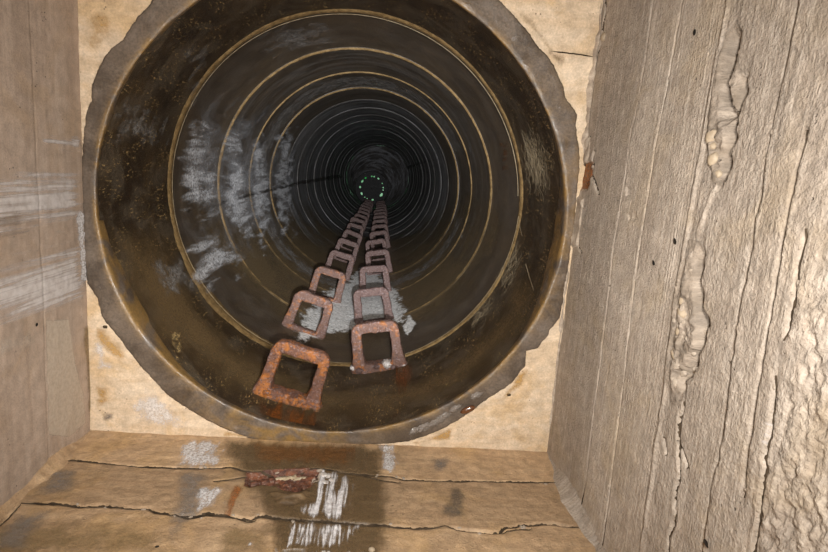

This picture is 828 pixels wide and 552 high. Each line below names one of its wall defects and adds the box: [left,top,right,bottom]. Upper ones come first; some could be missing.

corrosion [582,163,593,189]
water stain [0,173,86,315]
crack [783,229,808,341]
crack [68,459,279,482]
crack [0,502,579,534]
water stain [225,433,394,552]
crack [301,468,556,485]
crack [744,375,778,552]